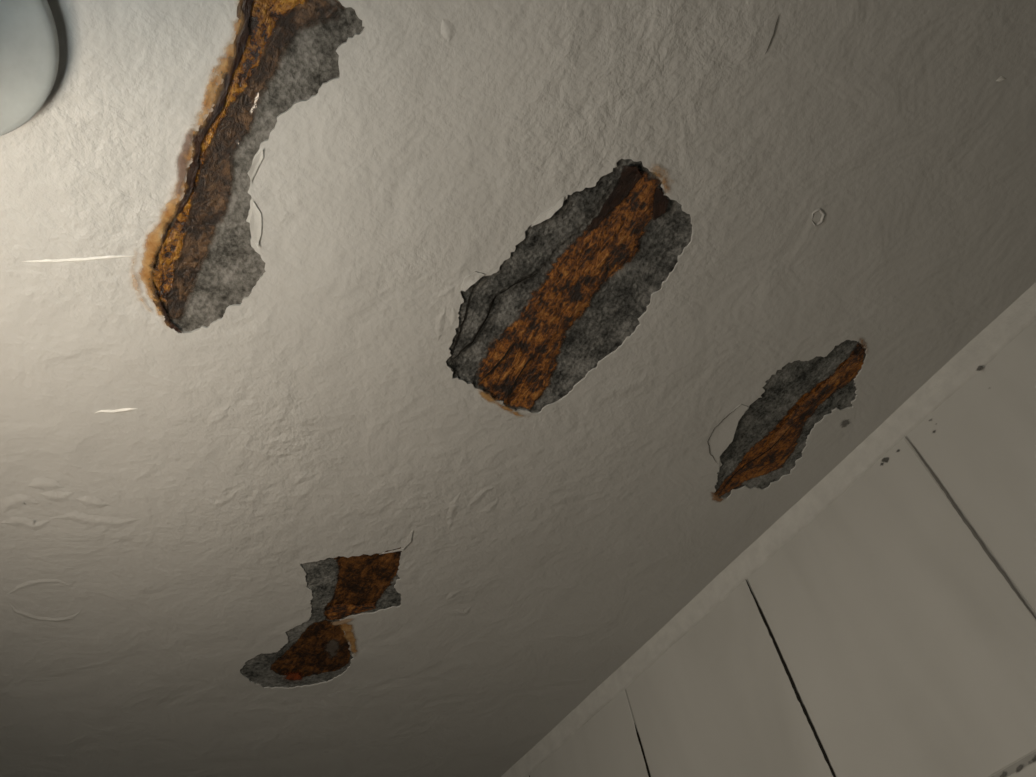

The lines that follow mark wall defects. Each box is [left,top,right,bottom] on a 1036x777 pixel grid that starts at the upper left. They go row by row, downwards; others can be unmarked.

rust [132,19,242,315]
spalling [149,0,364,333]
spalling [446,159,692,412]
spalling [707,340,866,498]
spalling [240,531,413,688]
rust [333,619,357,653]